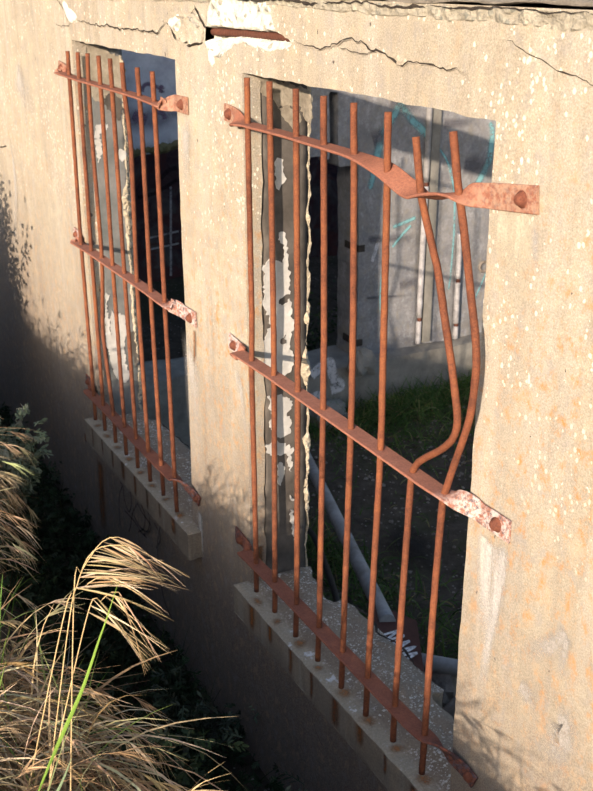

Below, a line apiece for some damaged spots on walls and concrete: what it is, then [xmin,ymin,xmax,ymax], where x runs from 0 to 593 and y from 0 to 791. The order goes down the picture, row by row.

crack [56,1,176,40]
spalling [168,0,292,65]
crack [293,37,467,76]
crack [250,0,593,15]
crack [509,40,593,86]
peeling [81,44,134,275]
peeling [257,76,313,391]
peeling [105,285,143,410]
peeling [265,394,294,486]
spalling [302,407,311,567]